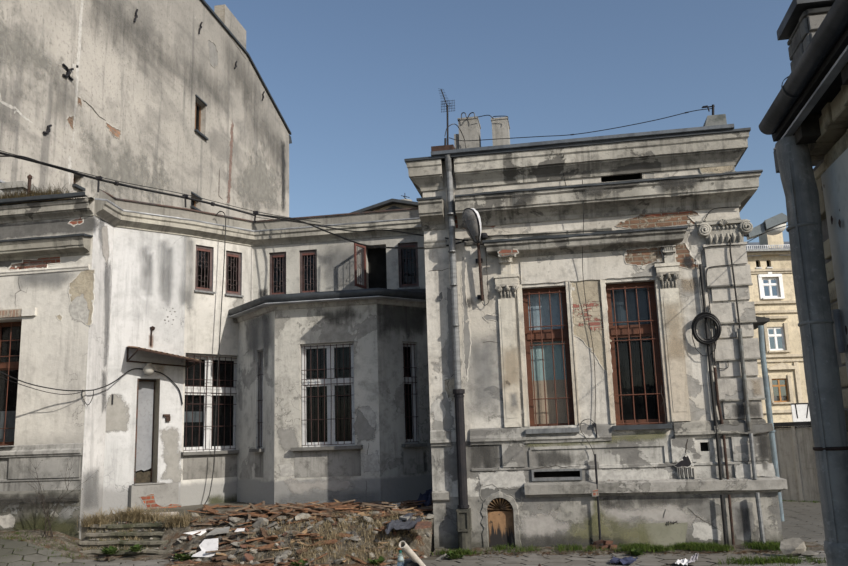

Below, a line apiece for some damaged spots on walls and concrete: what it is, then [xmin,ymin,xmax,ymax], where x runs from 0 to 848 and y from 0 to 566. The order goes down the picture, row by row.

flaking render [105,122,121,140]
spalling [614,210,699,229]
spalling [623,246,664,269]
spalling [674,242,699,270]
flaking render [56,269,95,326]
flaking render [570,279,613,372]
flaking render [139,493,182,509]
peeling [0,514,16,529]
flaking render [692,522,722,541]